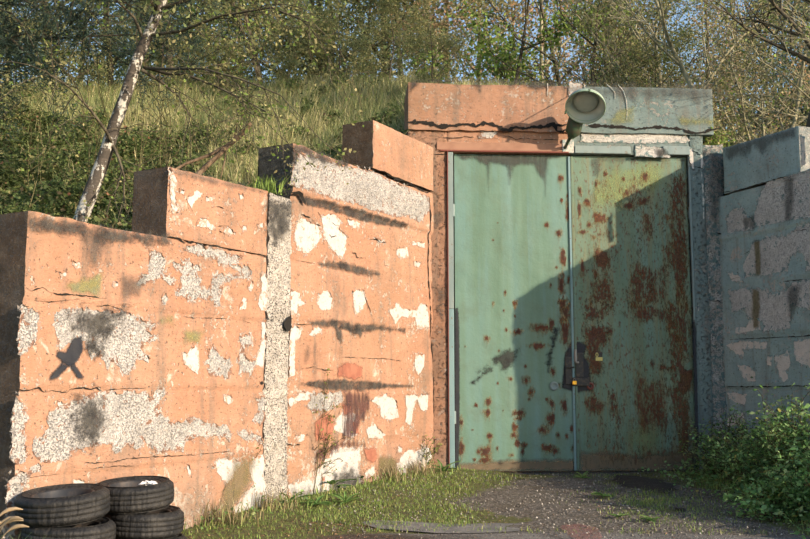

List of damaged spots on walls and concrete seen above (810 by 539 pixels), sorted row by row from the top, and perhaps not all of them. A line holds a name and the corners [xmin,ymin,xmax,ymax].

crack [407,119,567,155]
crack [588,123,720,134]
spalling [725,134,810,384]
peeling [17,304,42,356]
peeling [52,306,159,376]
peeling [137,243,268,380]
corrosion [532,249,570,344]
corrosion [560,172,693,464]
peeling [1,387,267,539]
corrosion [474,433,498,463]
corrosion [511,410,527,455]
corrosion [539,398,567,433]